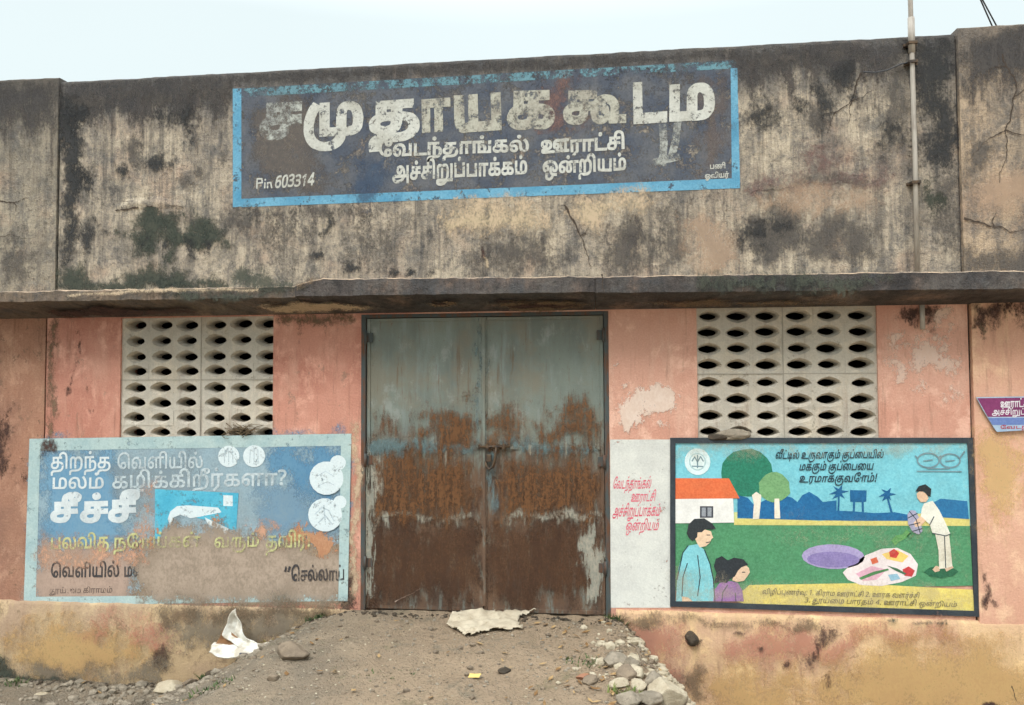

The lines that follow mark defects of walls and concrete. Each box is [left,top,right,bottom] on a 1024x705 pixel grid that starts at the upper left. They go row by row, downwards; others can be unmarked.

damp [50,85,230,266]
damp [737,37,1024,271]
crack [964,212,1023,233]
crack [971,54,1024,183]
damp [973,302,1024,338]
peeling [618,382,680,434]
peeling [255,520,338,559]
rust [365,387,604,610]